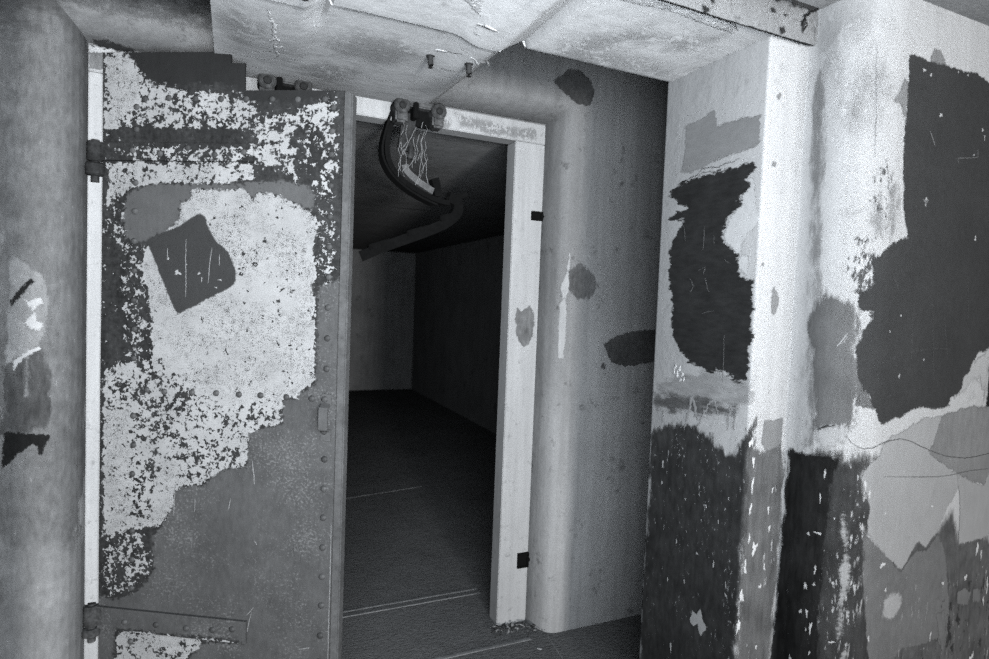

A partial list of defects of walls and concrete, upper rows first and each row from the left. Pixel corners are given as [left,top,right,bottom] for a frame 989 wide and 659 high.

peeling [0,0,88,659]
peeling [724,178,759,277]
peeling [640,422,874,659]
peeling [877,514,989,659]